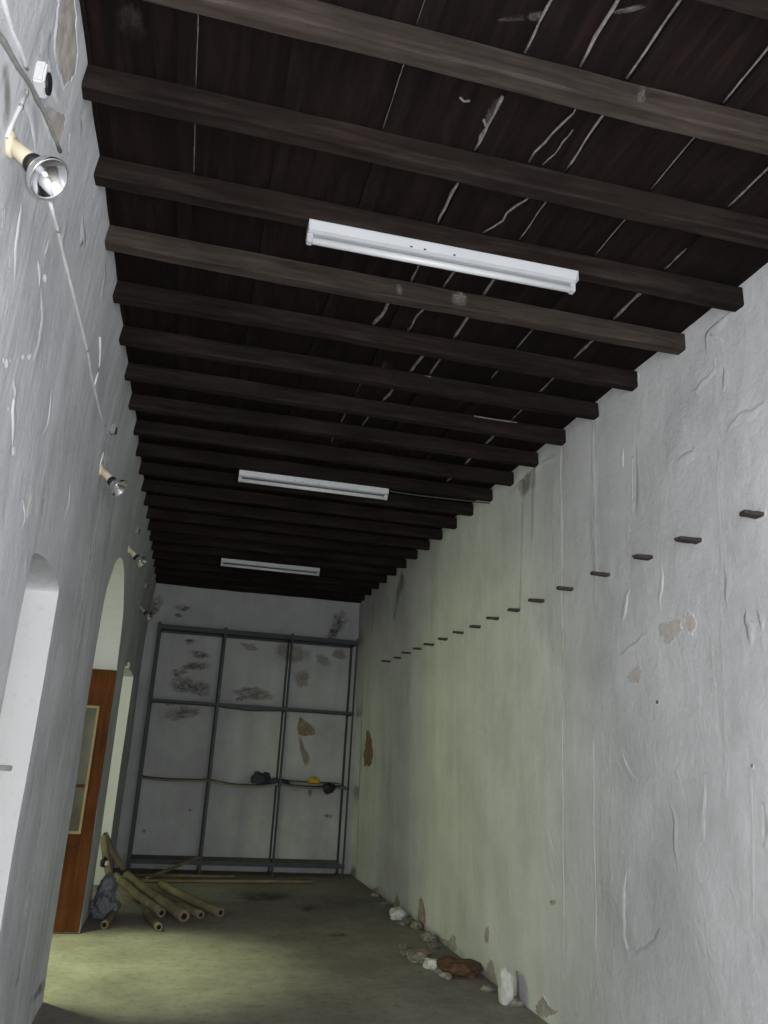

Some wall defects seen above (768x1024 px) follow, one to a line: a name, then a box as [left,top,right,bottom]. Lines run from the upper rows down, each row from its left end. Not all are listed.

flaking render [26,0,78,151]
flaking render [657,568,697,646]
flaking render [296,716,316,737]
flaking render [363,728,374,769]
flaking render [417,895,426,927]